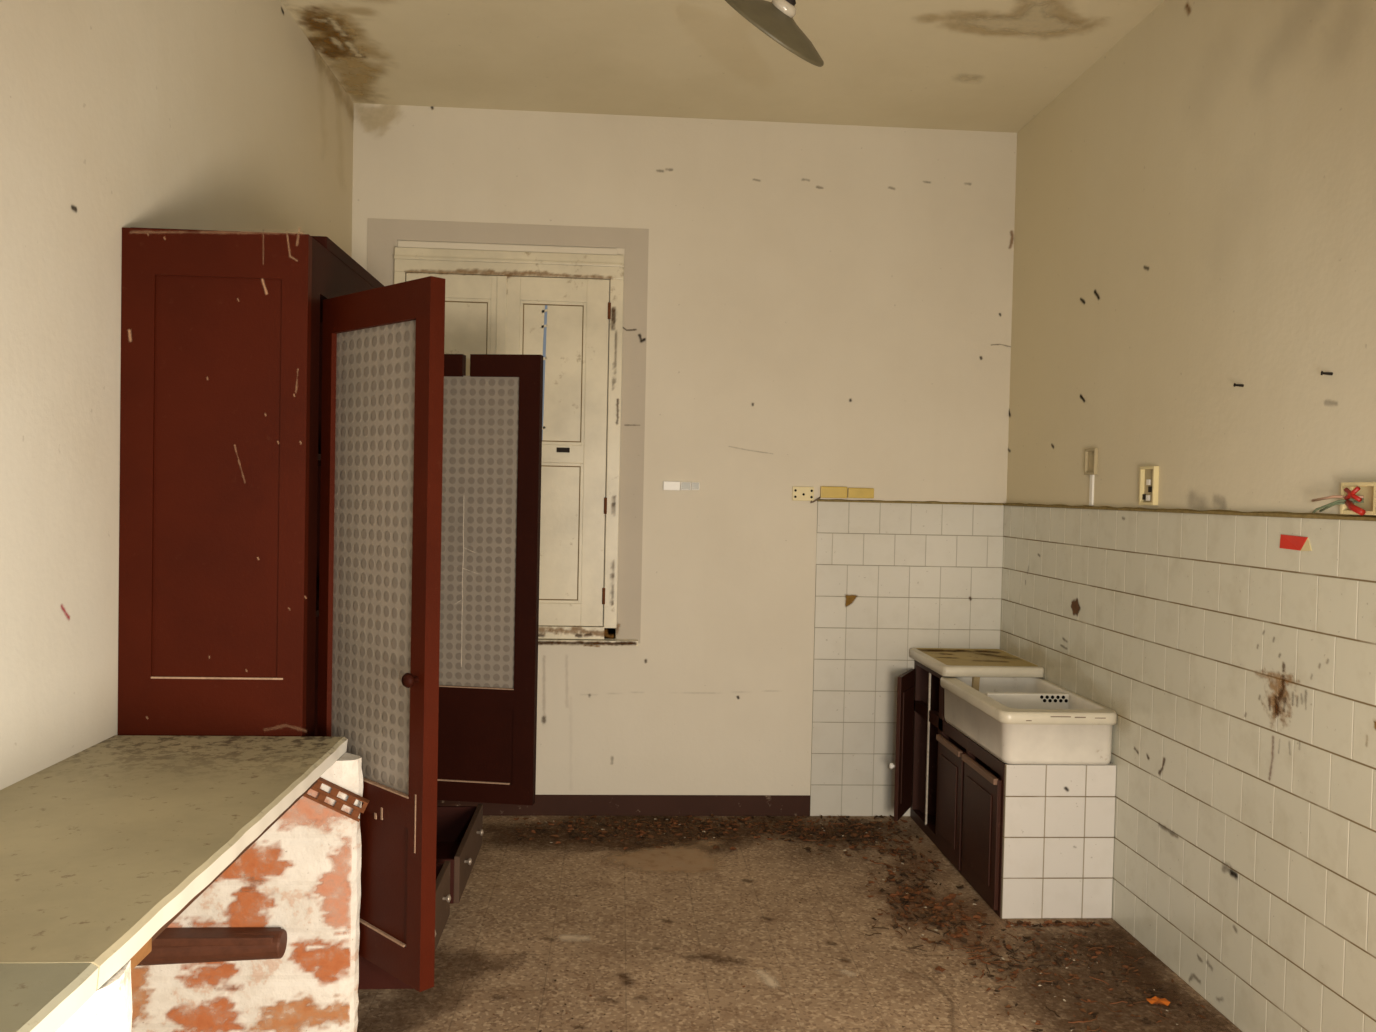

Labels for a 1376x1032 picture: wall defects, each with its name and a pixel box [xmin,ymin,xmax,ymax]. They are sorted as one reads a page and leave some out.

leakage [302,7,380,97]
corrosion [1268,664,1291,721]
peeling [167,844,293,928]
peeling [280,789,352,983]
peeling [131,967,149,1023]
peeling [167,961,350,1032]